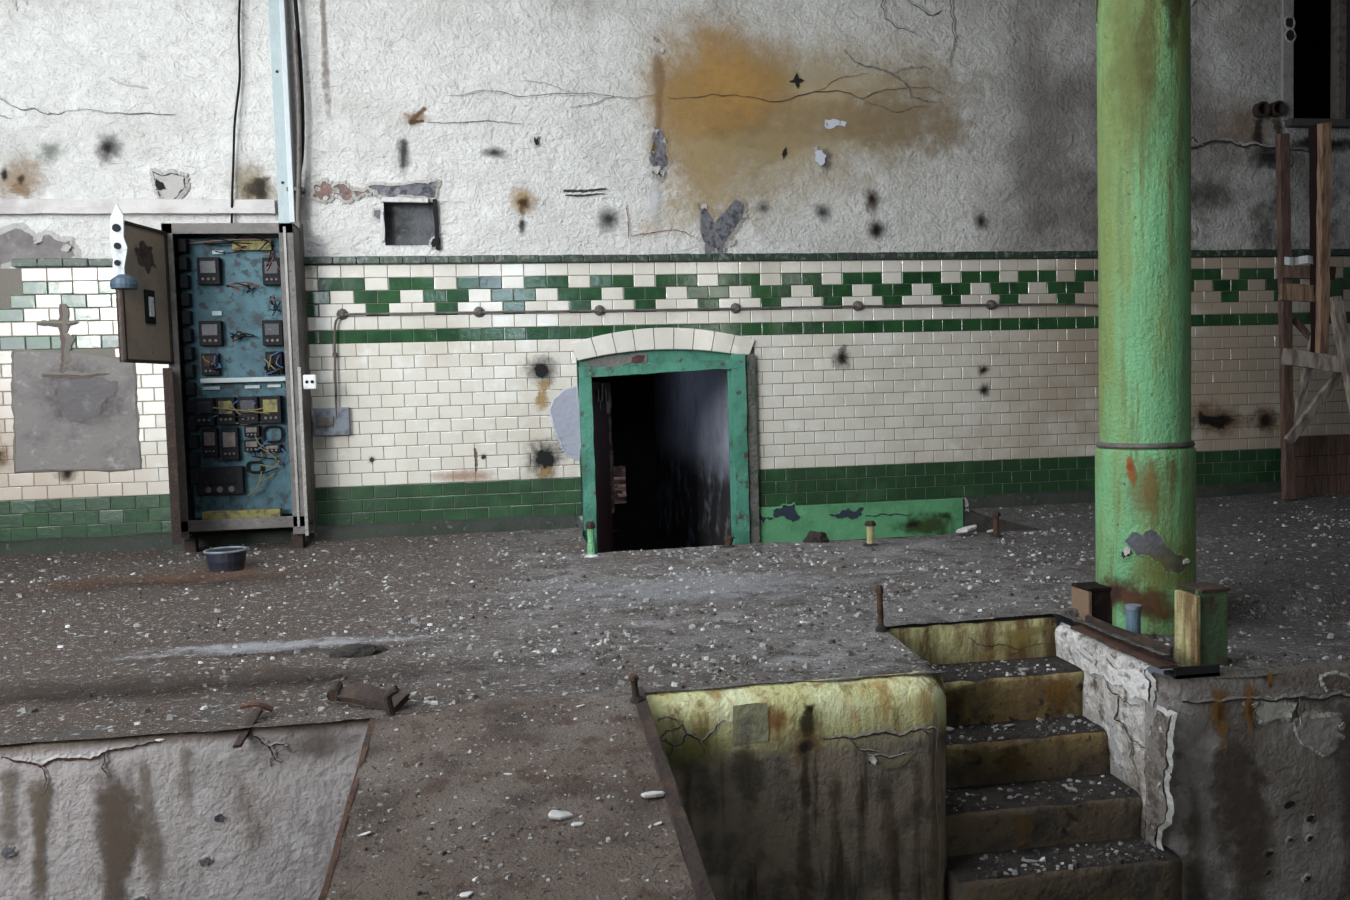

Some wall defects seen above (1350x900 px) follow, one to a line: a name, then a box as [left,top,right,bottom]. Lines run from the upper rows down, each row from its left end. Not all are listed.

damp [1164,0,1180,33]
crack [0,98,175,118]
crack [426,50,946,124]
crack [1191,137,1309,166]
flaking render [0,222,81,269]
corrosion [1126,457,1156,513]
peeling [759,502,802,523]
peeling [829,507,864,520]
peeling [1117,526,1190,577]
crack [1182,690,1350,729]
crack [657,715,726,759]
spalling [1078,646,1350,900]